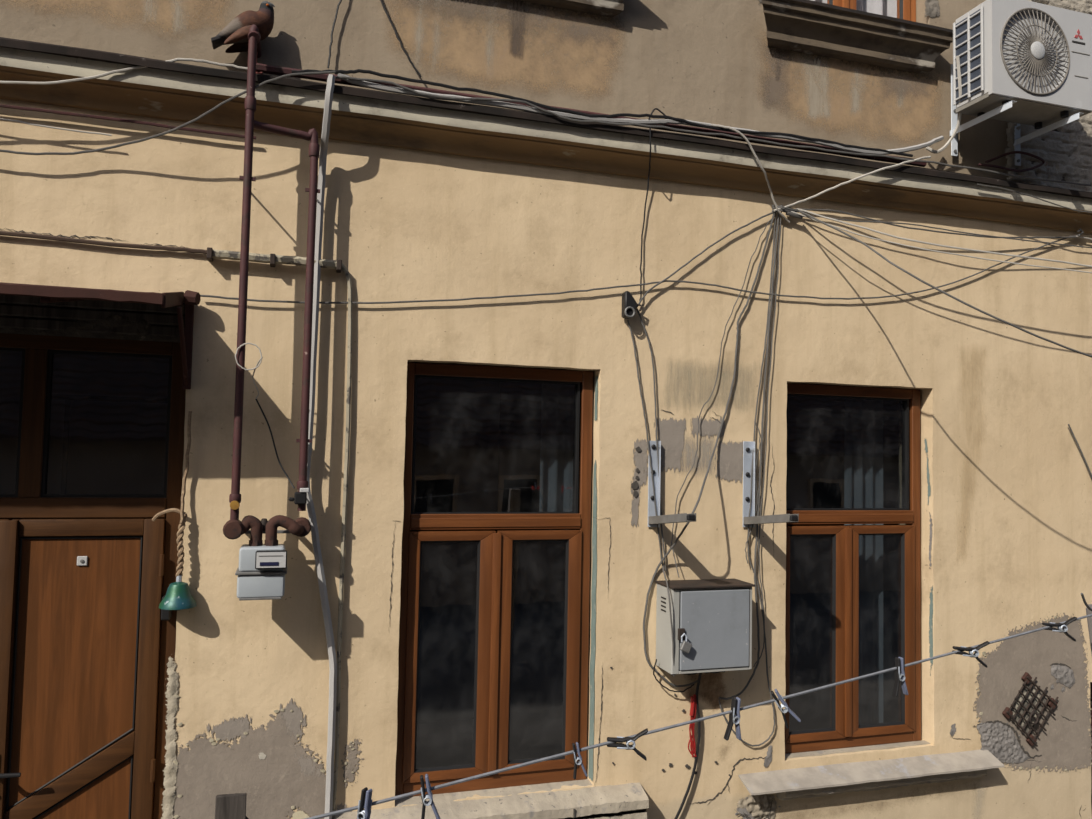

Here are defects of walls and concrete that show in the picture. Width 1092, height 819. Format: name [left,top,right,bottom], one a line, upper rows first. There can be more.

water stain [13,0,226,33]
peeling [630,416,743,527]
peeling [161,657,351,819]
peeling [341,738,364,788]
spalling [735,795,781,819]
peeling [973,613,1092,773]